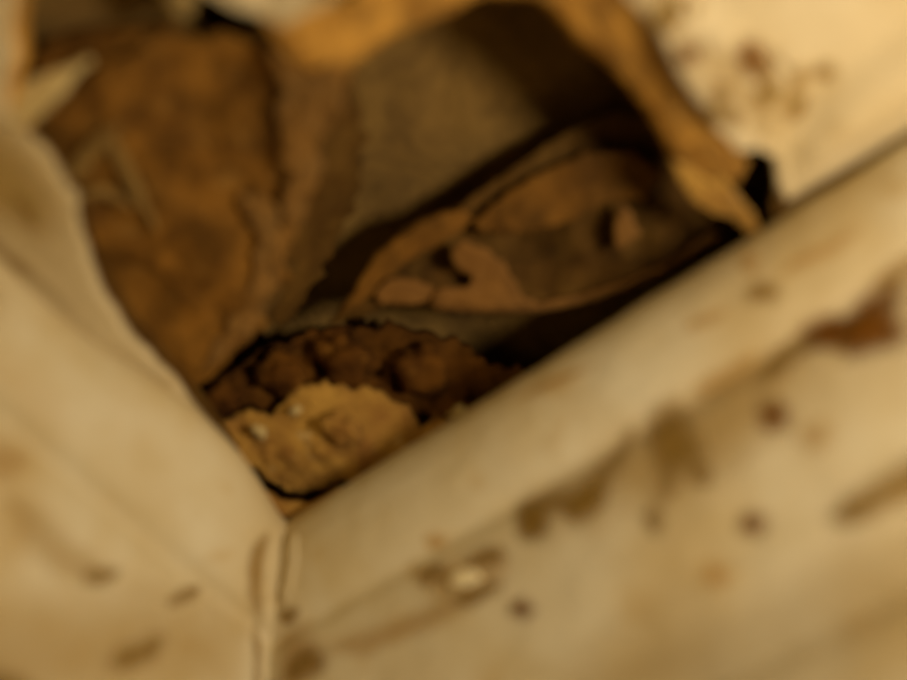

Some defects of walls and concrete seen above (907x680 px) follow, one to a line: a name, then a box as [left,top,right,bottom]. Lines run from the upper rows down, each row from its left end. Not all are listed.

spalling [8,0,31,119]
spalling [166,0,244,35]
spalling [259,0,470,71]
spalling [543,0,776,229]
spalling [23,121,272,452]
spalling [251,467,348,502]
leakage [570,489,602,520]